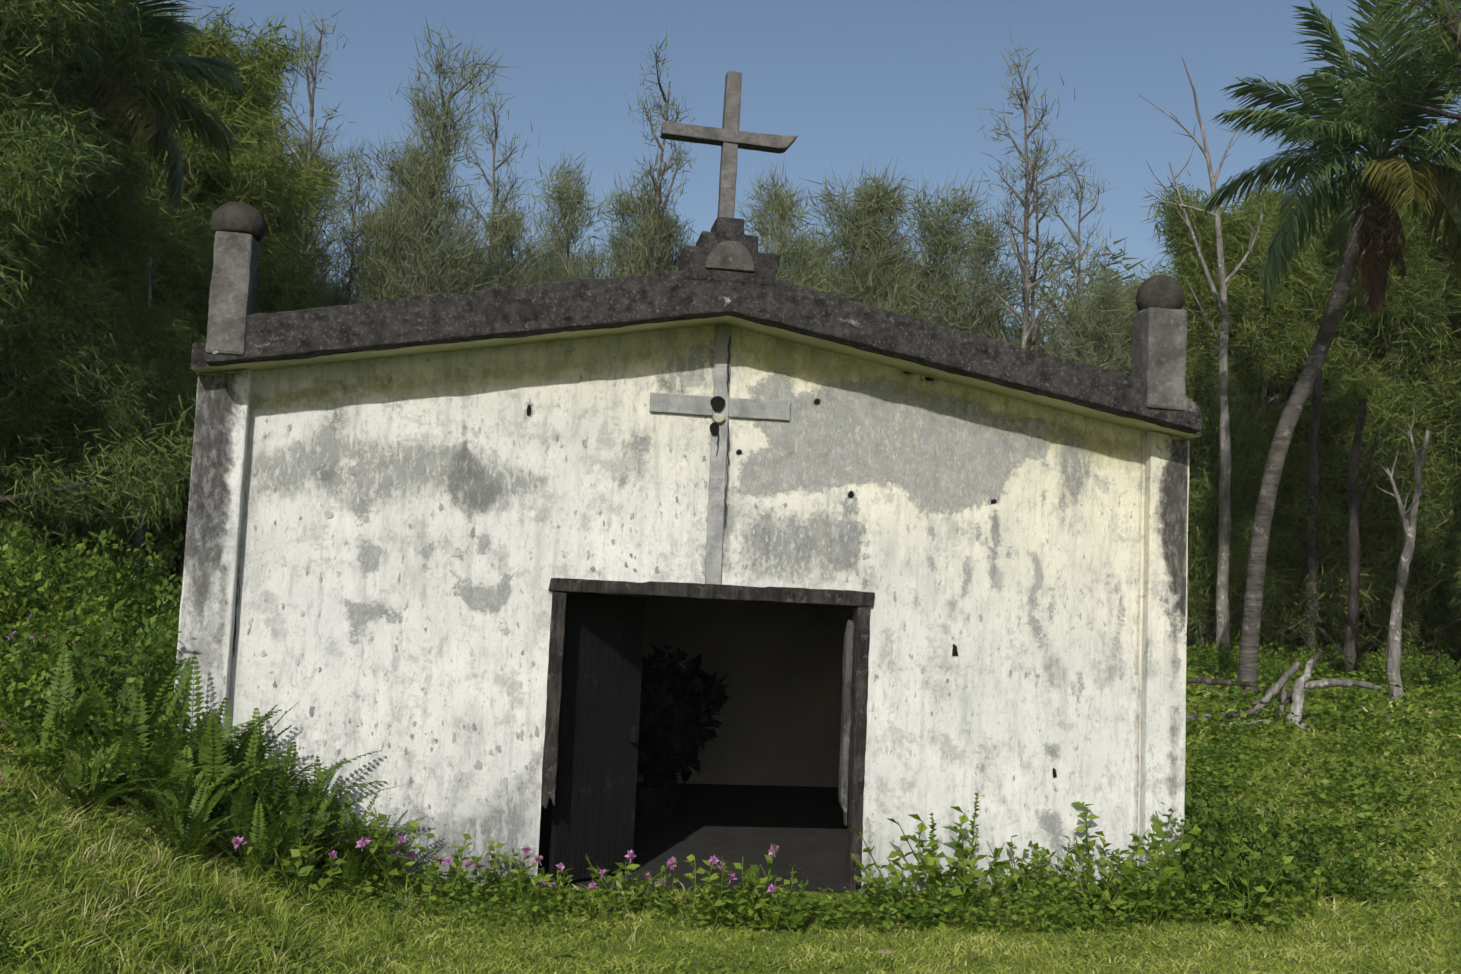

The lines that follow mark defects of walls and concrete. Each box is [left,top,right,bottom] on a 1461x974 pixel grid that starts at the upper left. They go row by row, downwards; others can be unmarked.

damp [177,371,239,694]
damp [251,410,542,516]
damp [747,513,860,574]
damp [1156,436,1188,664]